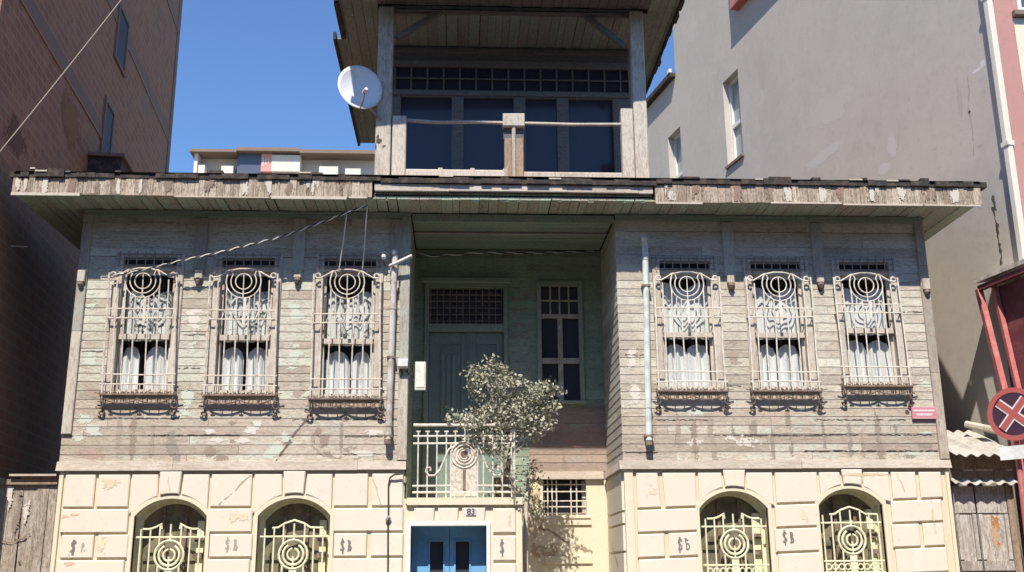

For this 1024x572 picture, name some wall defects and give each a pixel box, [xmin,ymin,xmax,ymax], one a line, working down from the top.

crack [966,77,974,156]
leakage [3,113,27,157]
crack [991,195,1002,265]
peeling [185,308,204,360]
peeling [81,350,100,368]
peeling [178,387,195,417]
peeling [72,414,103,441]
peeling [203,409,278,444]
peeling [262,431,290,459]
corrosion [990,515,1000,550]